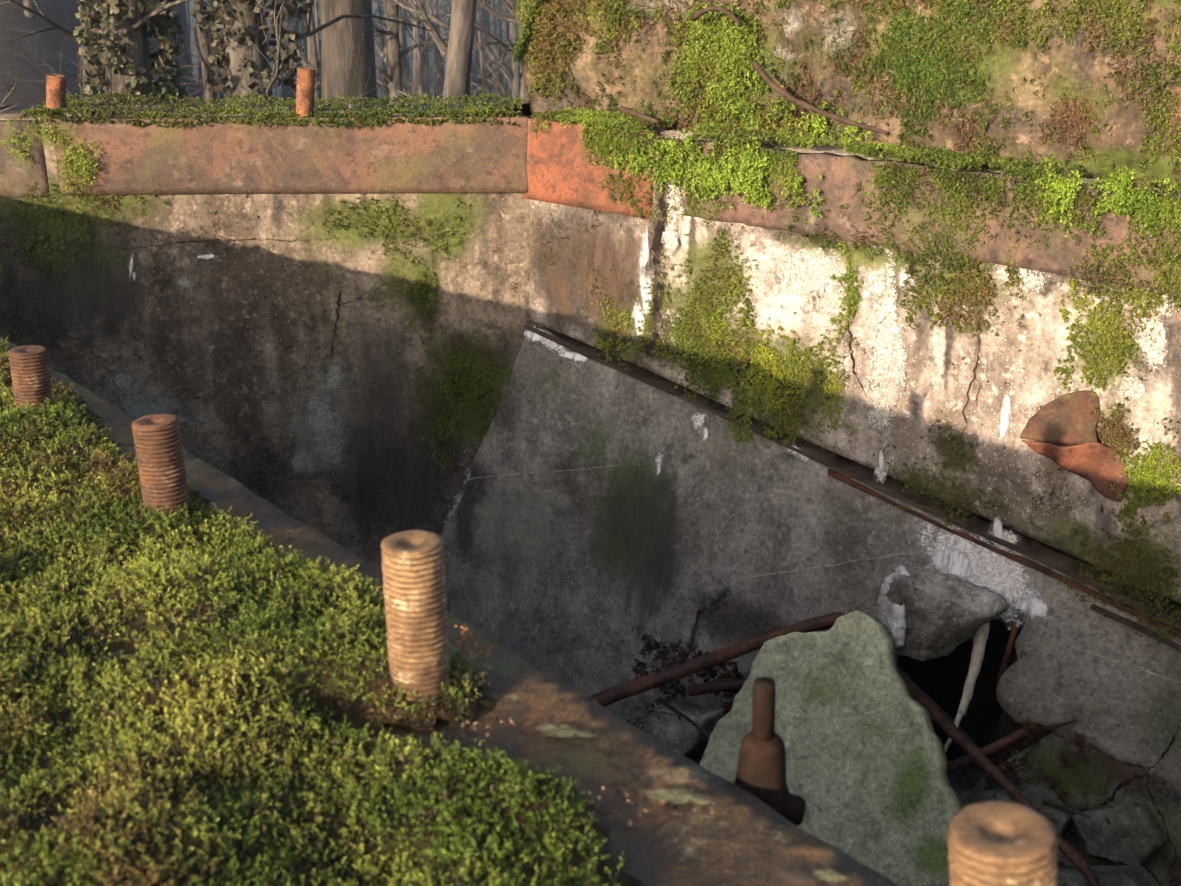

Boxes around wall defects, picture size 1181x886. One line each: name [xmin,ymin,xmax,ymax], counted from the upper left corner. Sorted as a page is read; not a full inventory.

crack [330,277,401,363]
crack [641,176,669,356]
corrosion [947,722,1043,776]
crack [1053,720,1181,864]